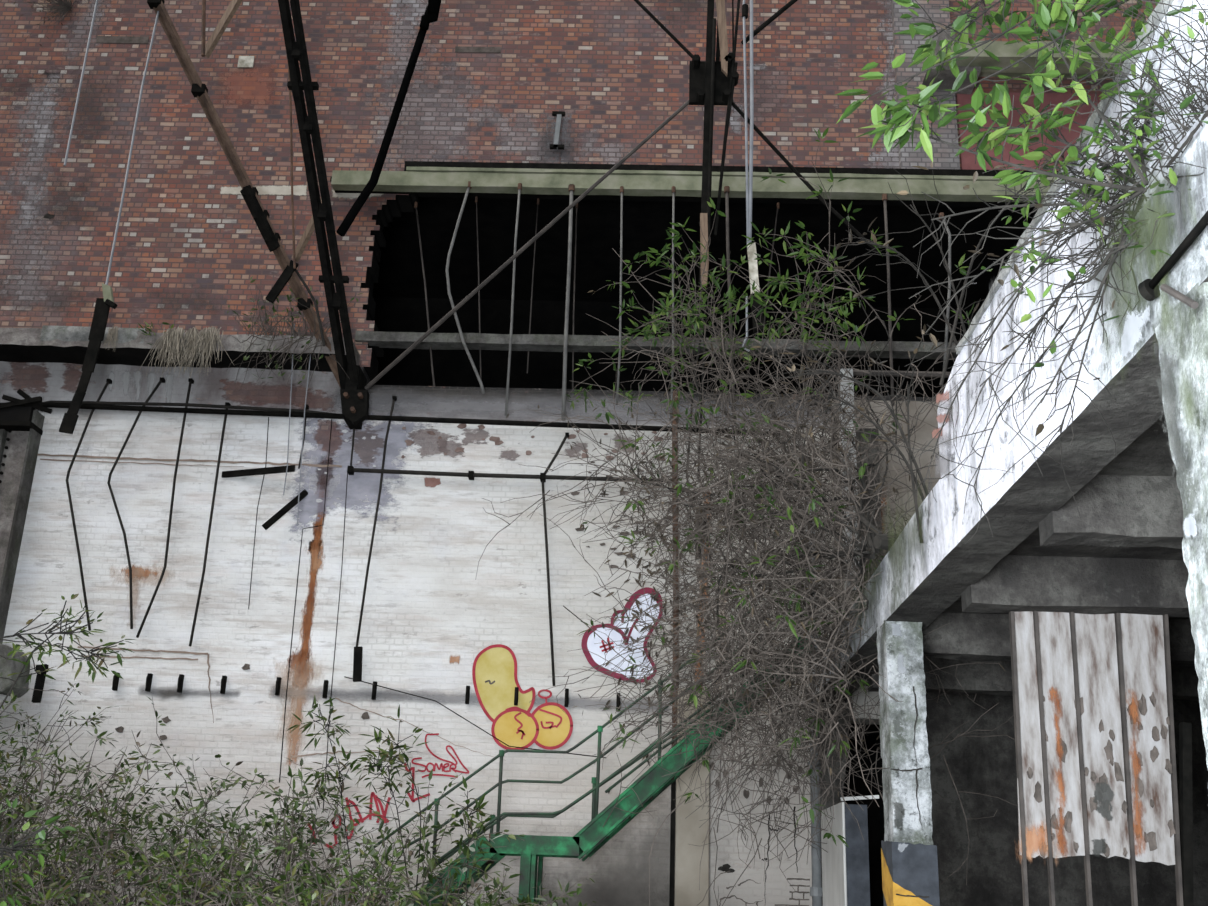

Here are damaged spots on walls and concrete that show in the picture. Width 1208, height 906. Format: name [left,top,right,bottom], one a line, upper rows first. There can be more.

peeling [220,379,535,531]
peeling [564,430,665,477]
peeling [586,515,670,569]
corrosion [122,566,157,578]
corrosion [287,457,332,765]